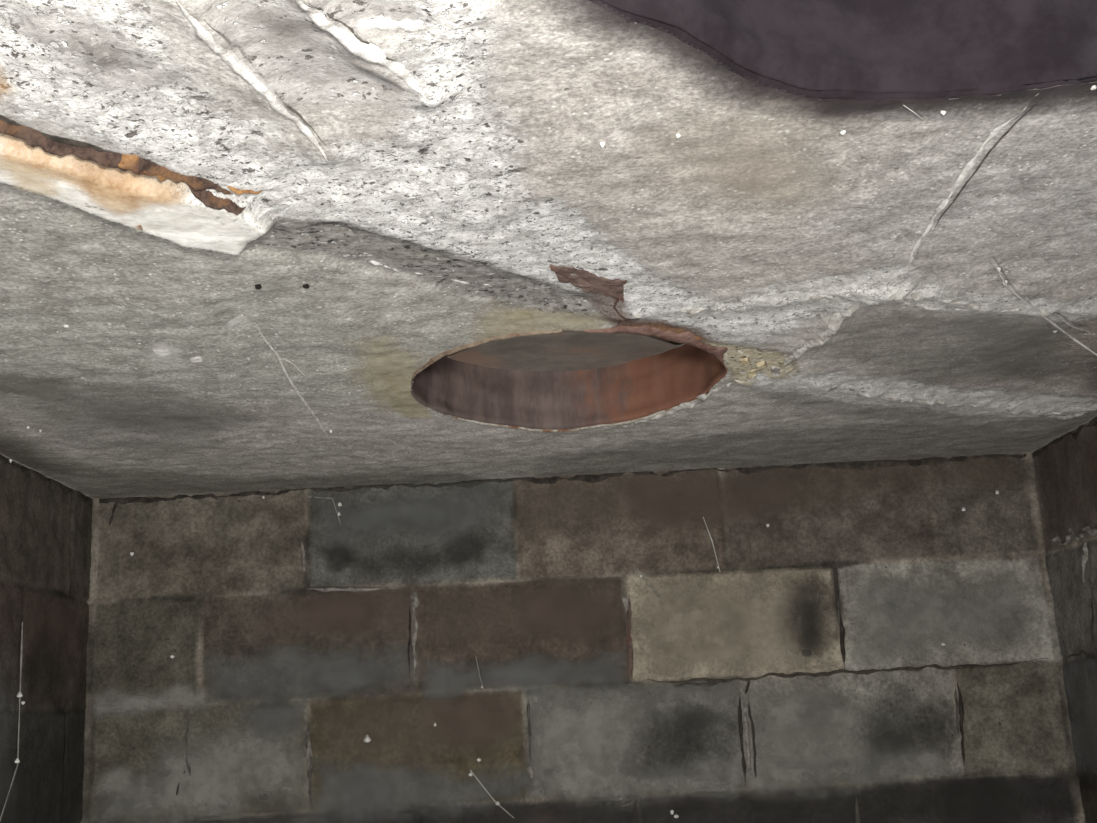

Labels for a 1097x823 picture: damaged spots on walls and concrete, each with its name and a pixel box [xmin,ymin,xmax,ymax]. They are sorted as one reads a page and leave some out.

peeling [18,8,174,90]
peeling [207,0,425,105]
corrosion [0,115,263,215]
spalling [0,133,594,313]
leakage [368,346,430,417]
corrosion [411,330,562,383]
corrosion [549,265,728,363]